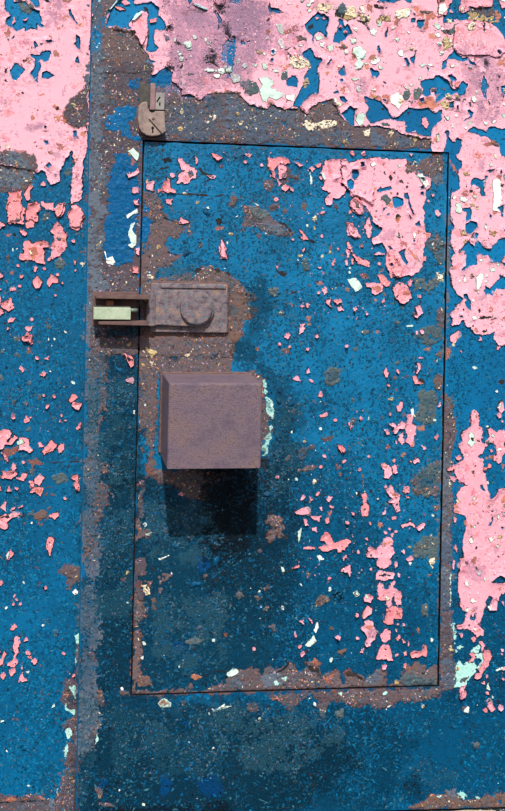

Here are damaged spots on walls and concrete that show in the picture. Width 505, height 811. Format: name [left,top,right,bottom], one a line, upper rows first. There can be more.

corrosion [405,81,479,110]
peeling [126,156,198,255]
peeling [260,157,303,192]
peeling [17,222,75,288]
corrosion [52,0,466,541]
peeling [0,416,44,496]
corrosion [59,457,110,590]
peeling [295,492,351,577]
peeling [345,357,505,713]
peeling [294,618,321,676]
corrosion [0,614,105,811]
corrosion [409,787,505,809]